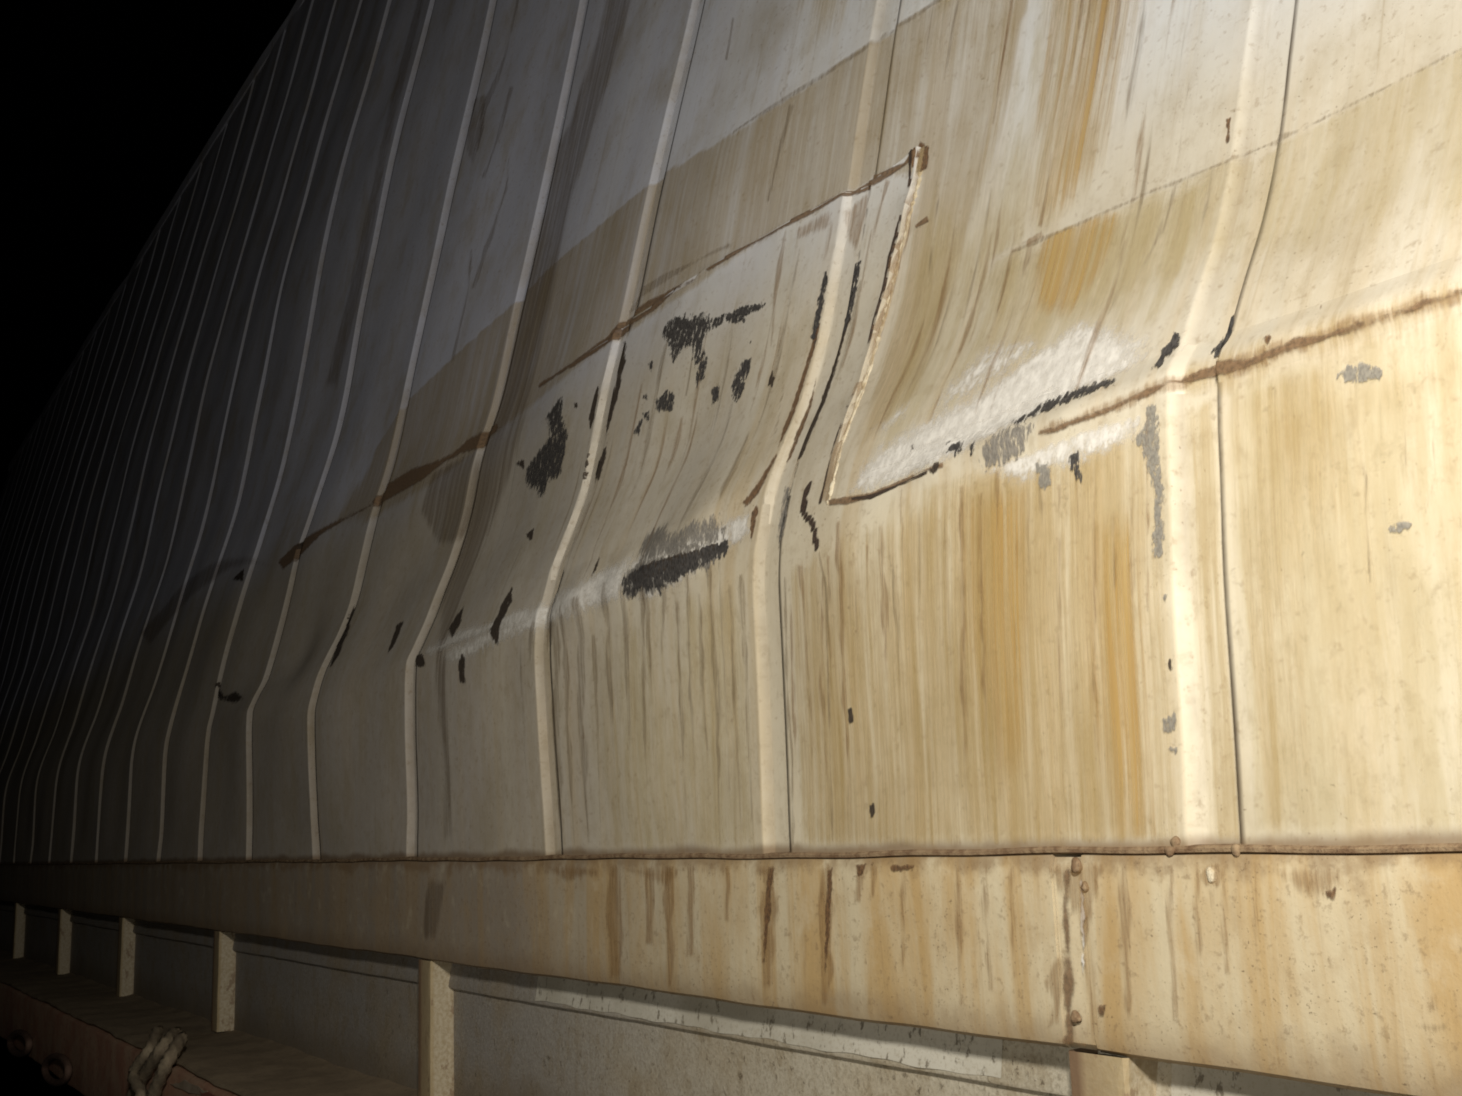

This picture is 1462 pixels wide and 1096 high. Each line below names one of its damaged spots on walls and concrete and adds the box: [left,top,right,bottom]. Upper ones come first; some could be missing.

corrosion [1065,0,1108,182]
corrosion [279,425,498,568]
peeling [415,261,861,683]
corrosion [539,149,923,387]
peeling [856,323,1181,557]
corrosion [1039,321,1363,433]
peeling [1211,314,1234,357]
peeling [1337,362,1382,382]
peeling [330,604,355,667]
peeling [1162,712,1177,754]
corrosion [763,867,774,960]
corrosion [1063,870,1085,1042]